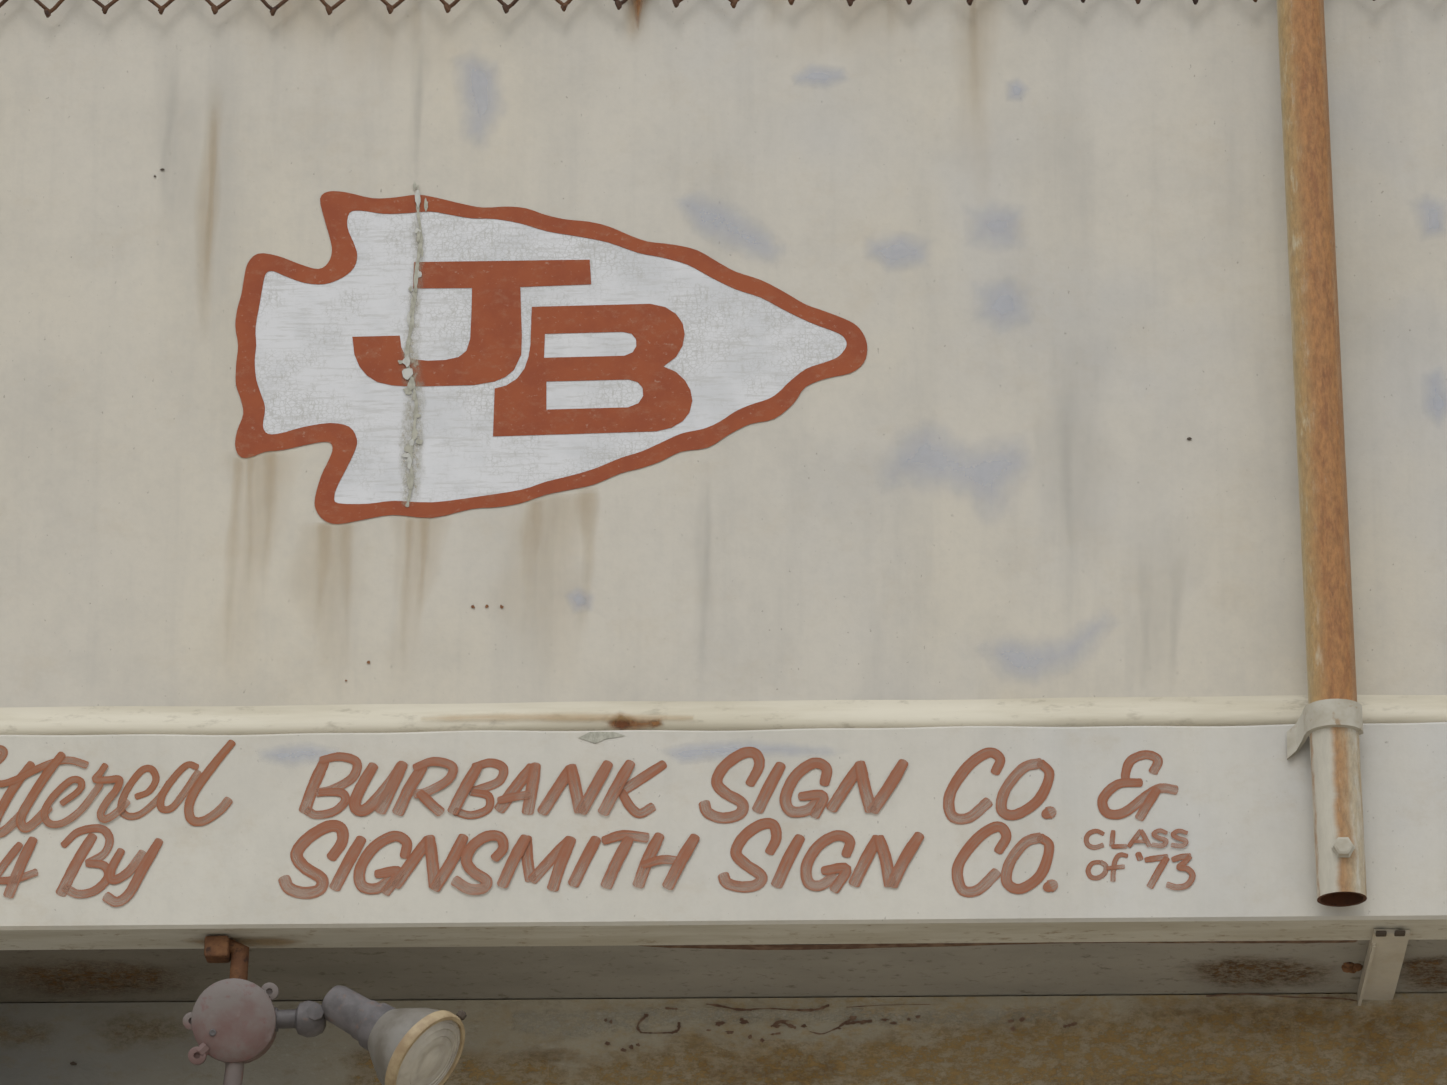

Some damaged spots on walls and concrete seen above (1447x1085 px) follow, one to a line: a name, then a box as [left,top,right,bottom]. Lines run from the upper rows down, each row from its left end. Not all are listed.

crack [398,181,428,507]
corrosion [610,714,660,729]
corrosion [1199,960,1317,985]